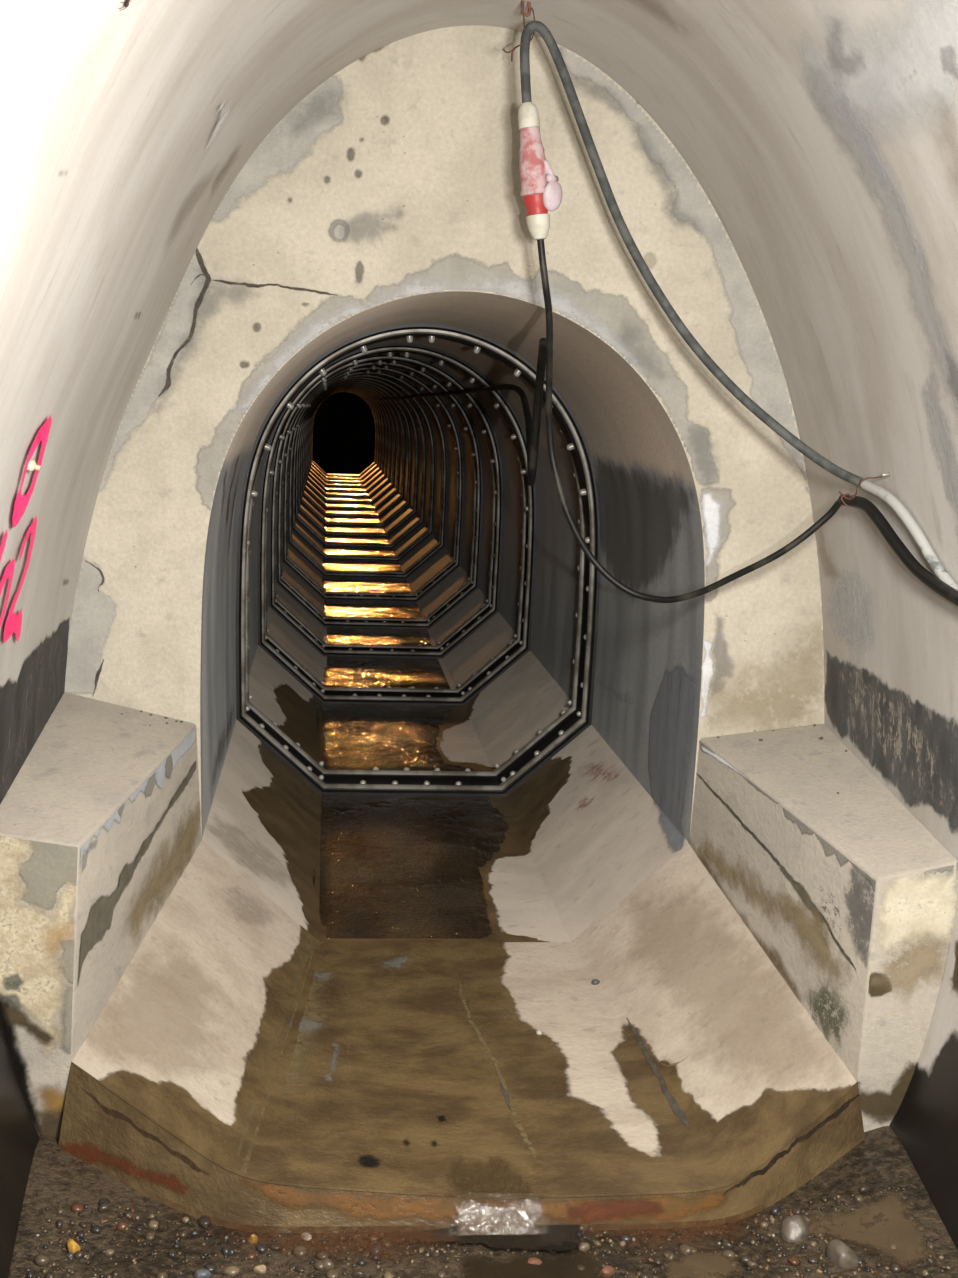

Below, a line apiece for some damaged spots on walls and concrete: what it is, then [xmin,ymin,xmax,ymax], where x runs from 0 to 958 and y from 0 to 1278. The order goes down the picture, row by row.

crack [159,249,336,396]
leakage [805,0,958,510]
leakage [274,476,496,771]
spalling [0,836,76,1050]
leakage [0,740,958,1278]
spalling [699,741,957,952]
spalling [869,973,892,996]
rust [62,1144,188,1193]
crack [83,1089,207,1174]
crack [724,1095,860,1195]